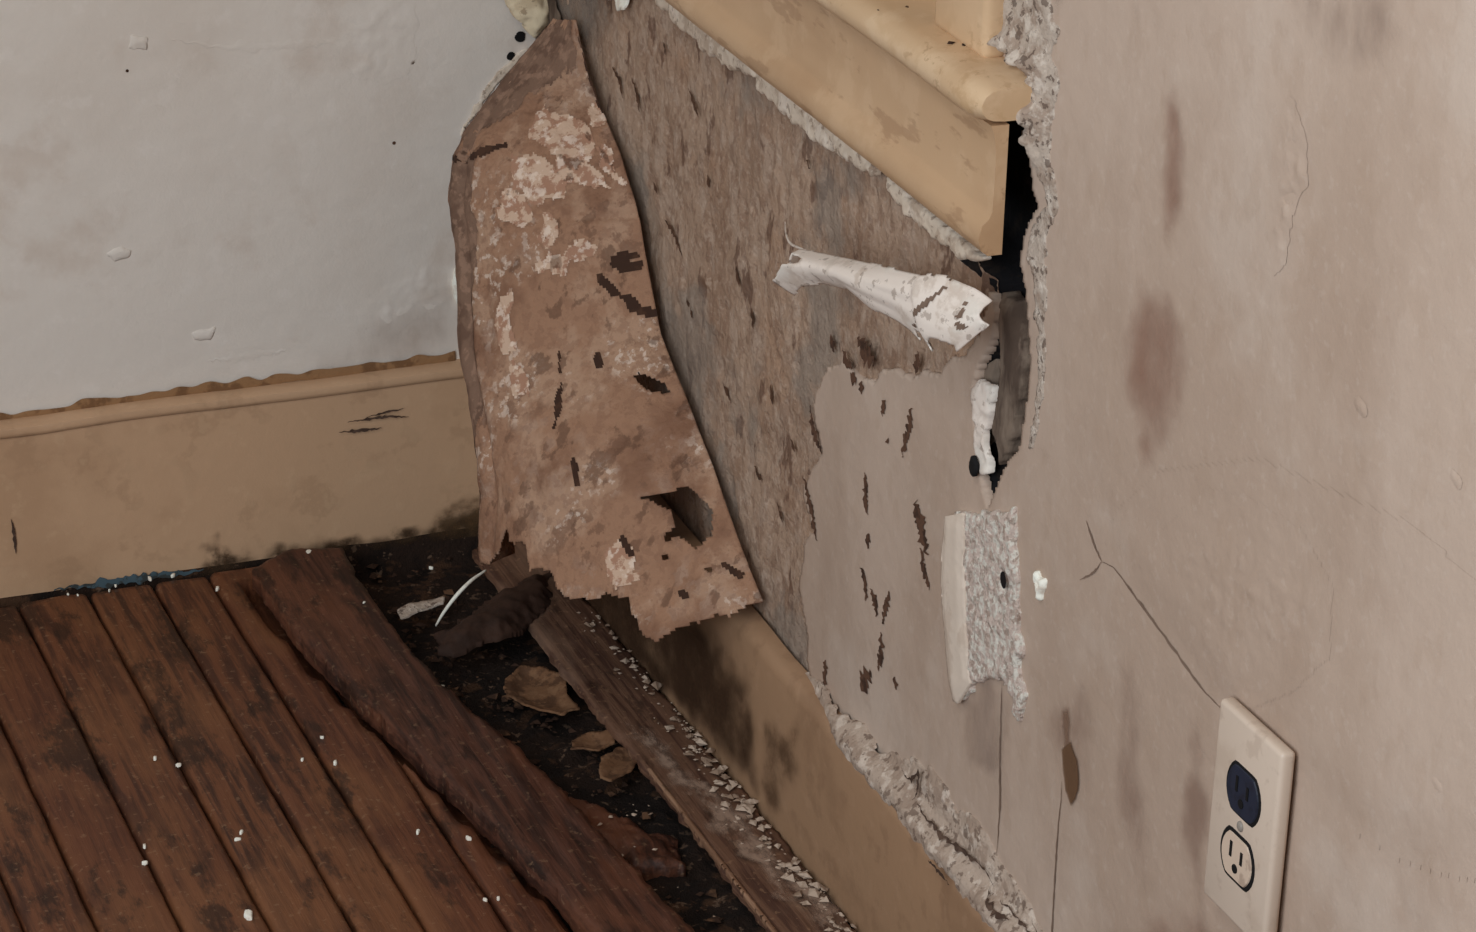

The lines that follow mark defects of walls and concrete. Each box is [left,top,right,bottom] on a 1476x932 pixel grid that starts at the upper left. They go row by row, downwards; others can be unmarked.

spalling [494,0,1060,932]
crack [1080,521,1218,706]